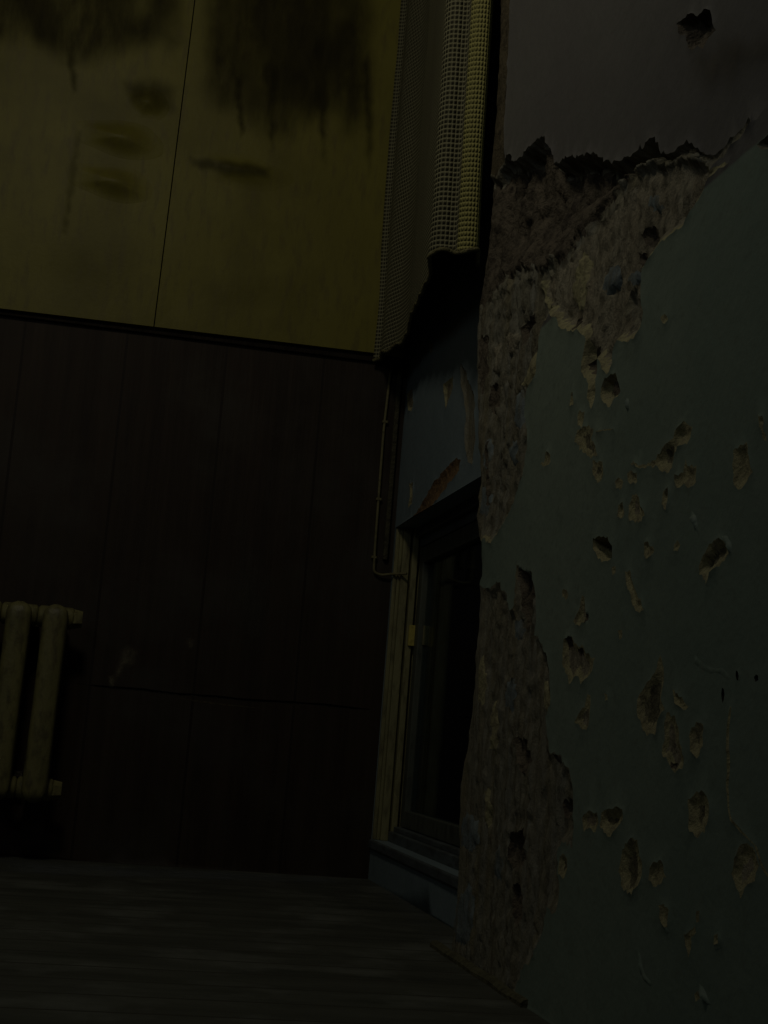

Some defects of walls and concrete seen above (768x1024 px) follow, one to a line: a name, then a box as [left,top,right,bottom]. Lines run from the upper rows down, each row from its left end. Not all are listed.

damp [214,0,368,124]
spalling [477,0,751,543]
peeling [452,564,574,991]